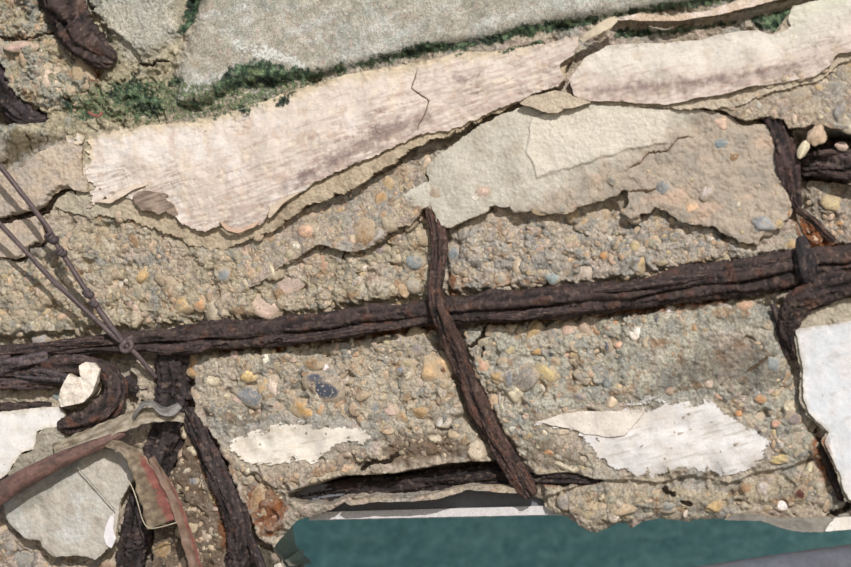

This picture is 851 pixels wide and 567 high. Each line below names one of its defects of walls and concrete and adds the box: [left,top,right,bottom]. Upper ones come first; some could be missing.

crack [411,71,429,131]
peeling [65,0,851,246]
rust [795,216,838,247]
spalling [0,100,523,480]
rust [343,328,410,341]
spalling [445,183,851,503]
flaking render [0,448,134,567]
rust [249,491,286,536]
peeling [222,421,518,538]
crack [361,452,406,470]
spalling [556,460,851,532]